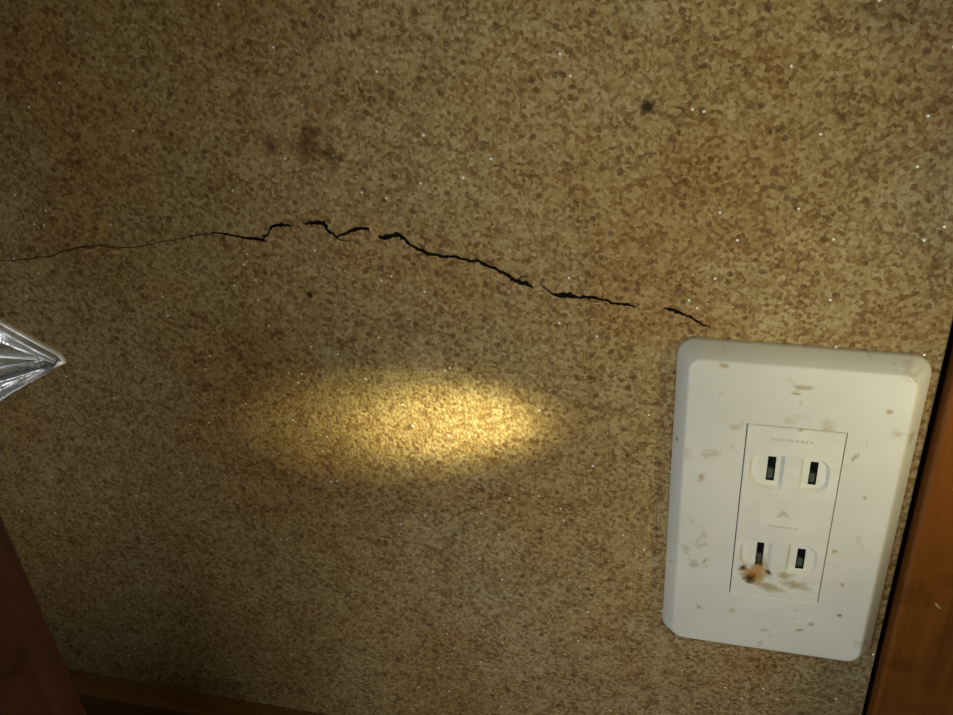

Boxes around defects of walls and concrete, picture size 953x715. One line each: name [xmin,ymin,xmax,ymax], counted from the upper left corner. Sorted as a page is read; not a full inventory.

crack [0,219,711,329]